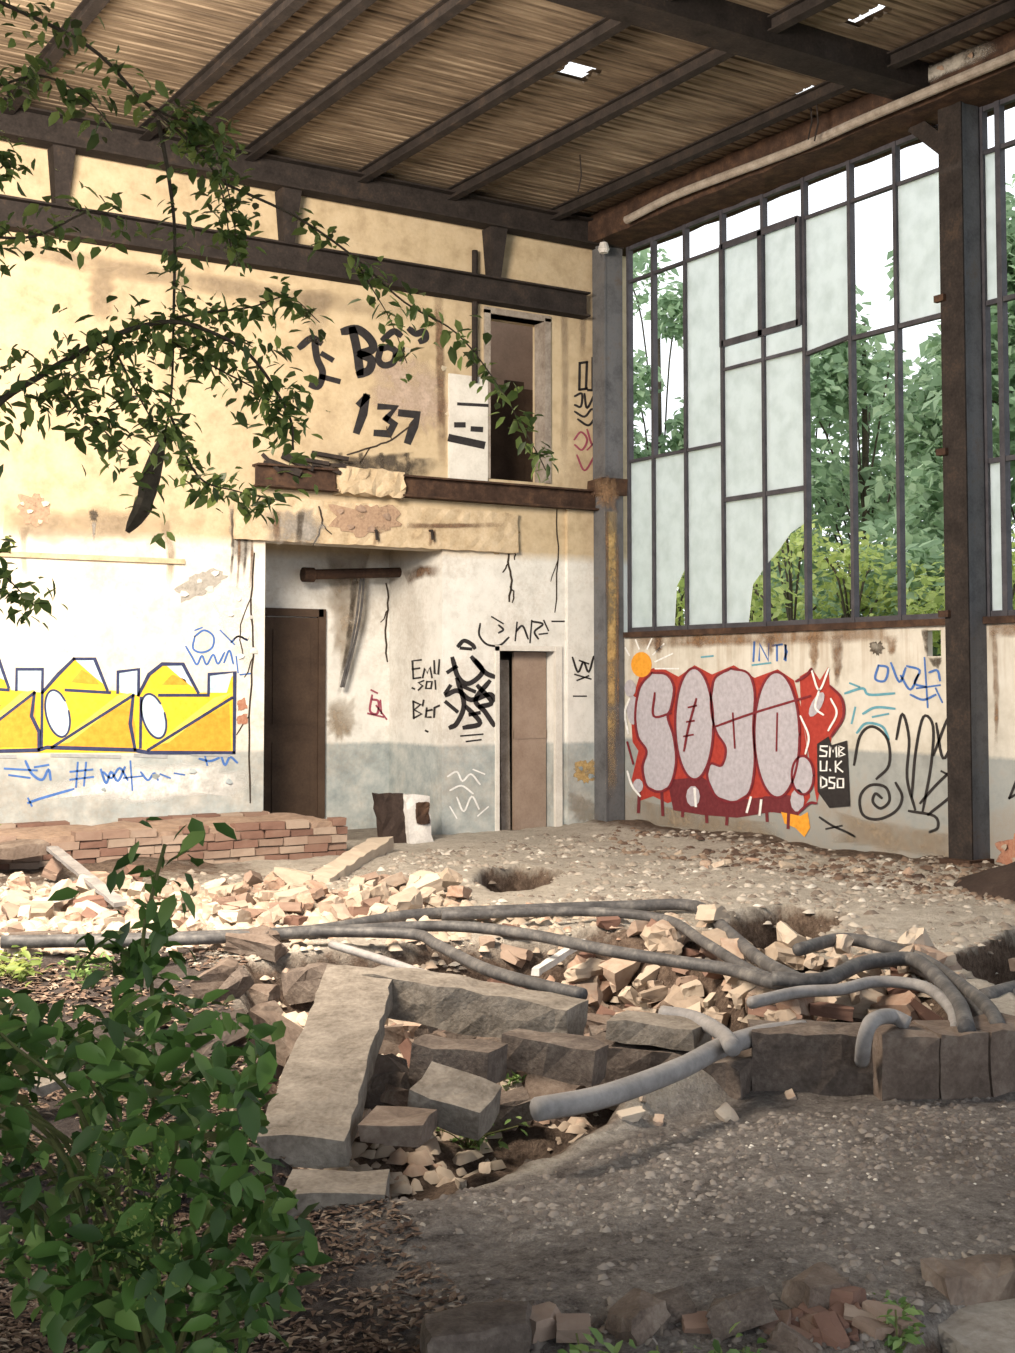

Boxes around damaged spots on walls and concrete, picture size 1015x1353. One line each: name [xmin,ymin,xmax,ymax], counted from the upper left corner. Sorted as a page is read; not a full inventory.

spalling [328,466,406,538]
water stain [332,564,364,669]
corrosion [596,480,619,730]